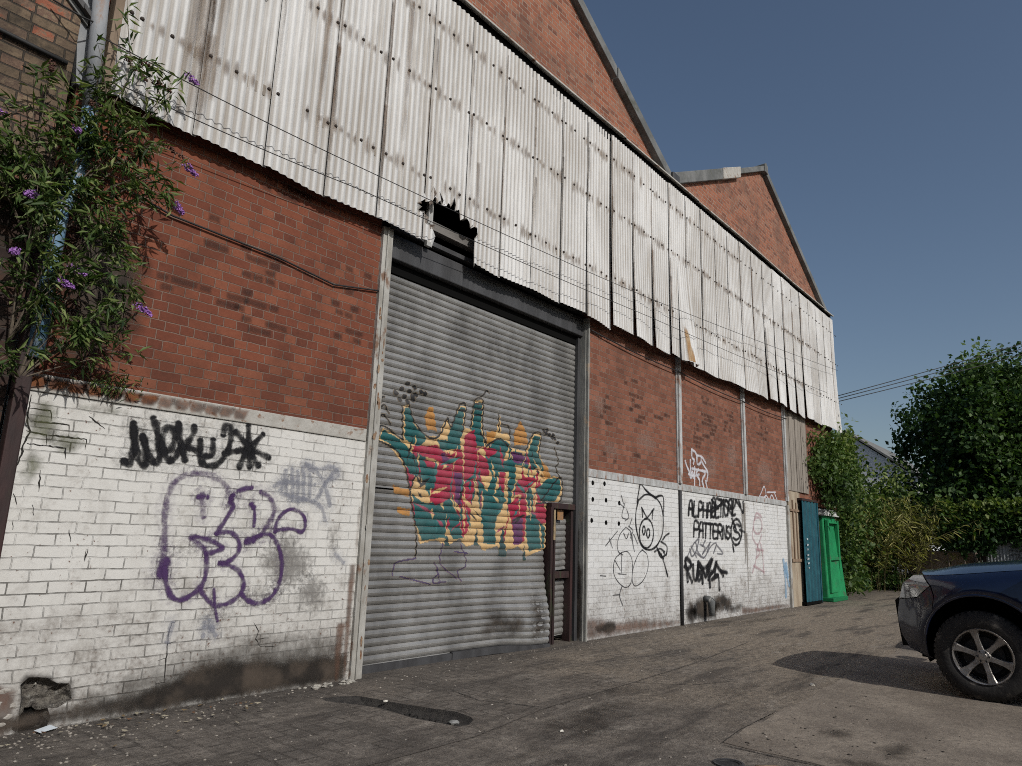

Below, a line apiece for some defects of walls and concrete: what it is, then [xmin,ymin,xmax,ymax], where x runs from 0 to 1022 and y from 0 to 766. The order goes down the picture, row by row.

peeling [418,186,478,263]
leakage [686,595,780,622]
spalling [0,676,72,734]
leakage [0,647,345,730]